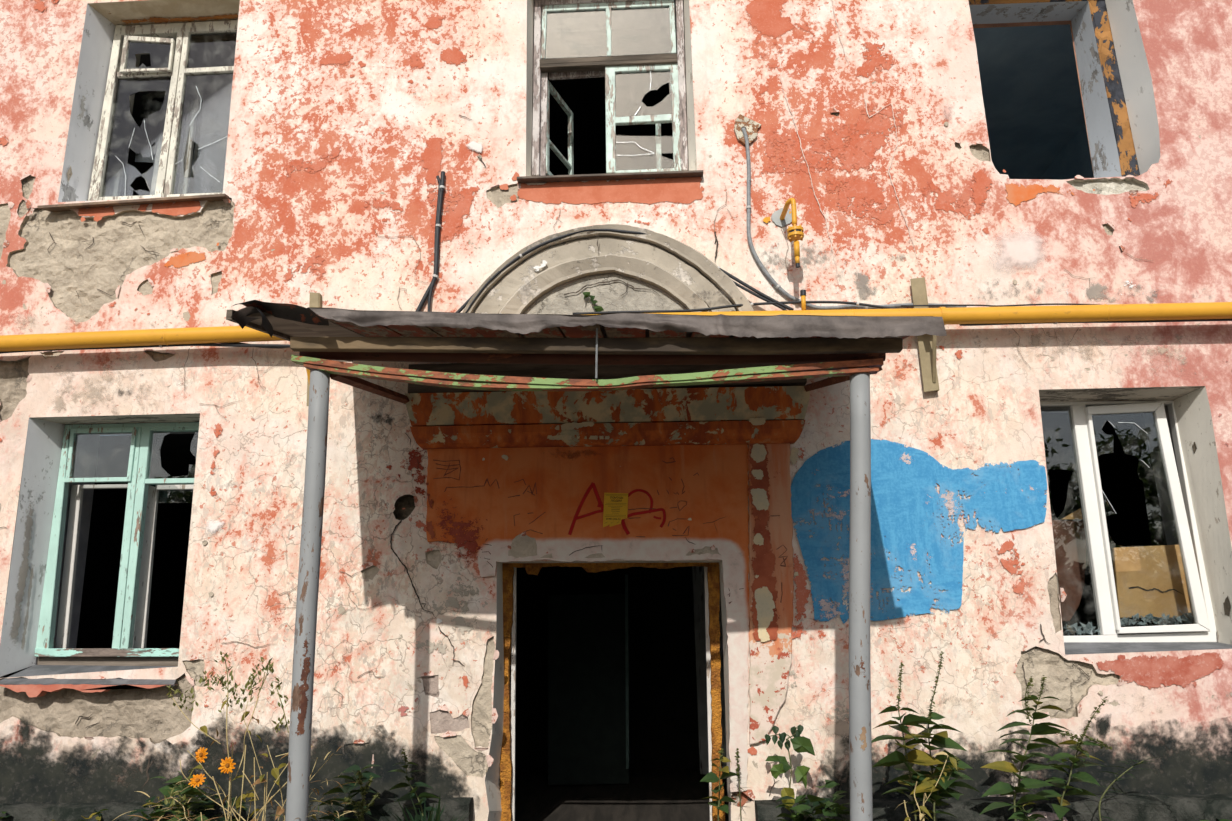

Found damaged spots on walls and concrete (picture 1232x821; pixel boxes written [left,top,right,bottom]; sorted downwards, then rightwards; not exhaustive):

flaking render [913,139,1172,221]
flaking render [0,174,235,322]
flaking render [1102,222,1125,252]
flaking render [0,351,64,421]
peeling [547,421,610,440]
crack [390,520,464,666]
damp [20,717,33,742]
flaking render [0,646,218,744]
flaking render [398,636,499,778]
damp [1097,717,1110,735]
flaking render [1013,646,1224,719]